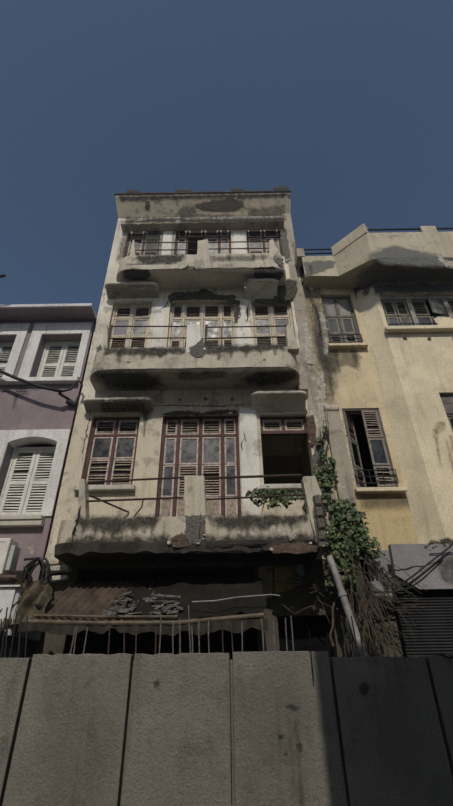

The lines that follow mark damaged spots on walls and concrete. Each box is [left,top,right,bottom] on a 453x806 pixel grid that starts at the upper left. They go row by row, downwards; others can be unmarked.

spalling [196,197,245,212]
spalling [123,268,151,280]
spalling [168,229,313,322]
spalling [189,337,206,357]
damp [306,288,334,399]
spalling [99,398,145,412]
spalling [185,515,206,545]
damp [204,512,316,545]